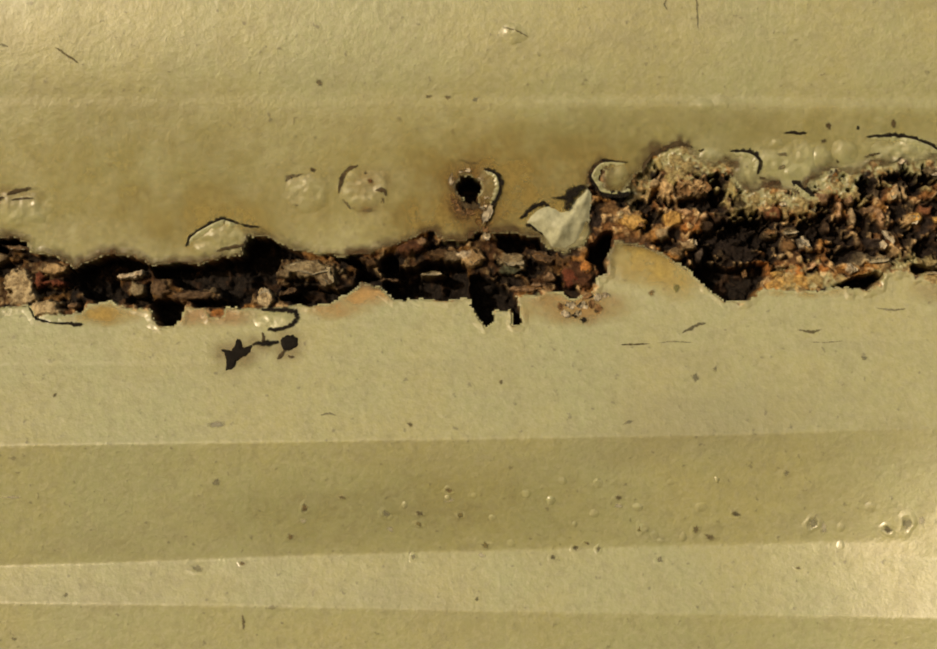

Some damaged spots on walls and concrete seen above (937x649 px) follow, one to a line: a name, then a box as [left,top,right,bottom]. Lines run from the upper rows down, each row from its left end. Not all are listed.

peeling [24,302,82,327]
spalling [77,238,542,332]
corrosion [51,136,937,335]
spalling [482,232,553,266]